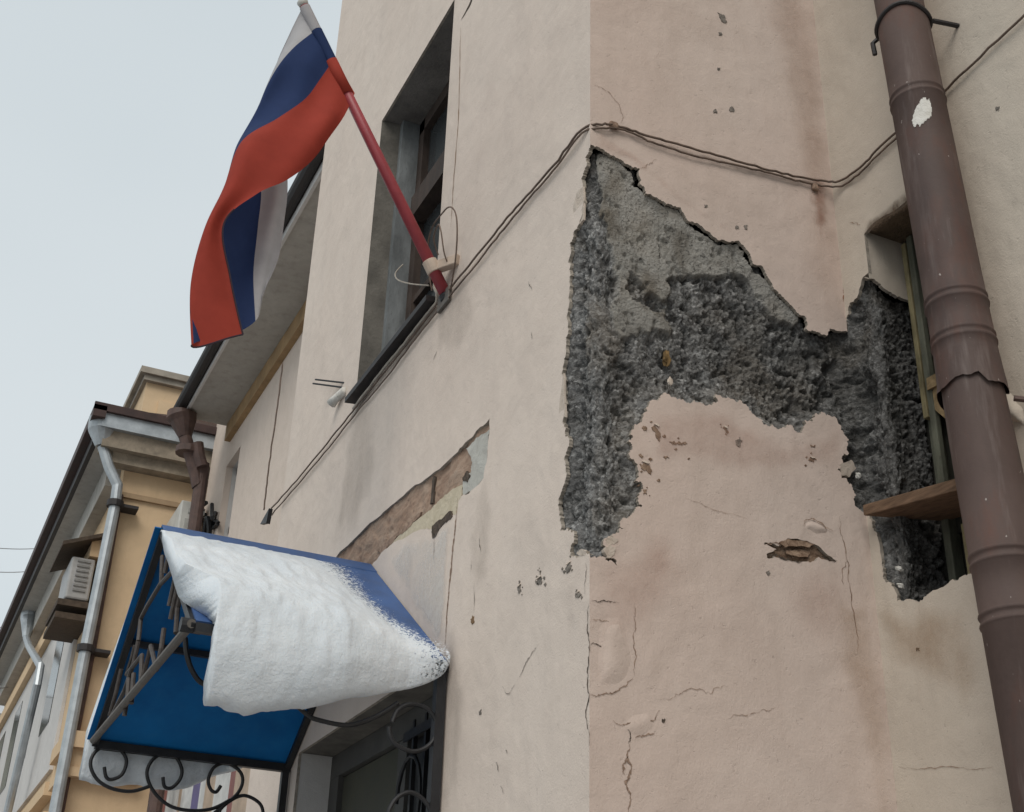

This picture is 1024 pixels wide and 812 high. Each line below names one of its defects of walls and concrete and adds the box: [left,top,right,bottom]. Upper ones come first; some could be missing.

flaking render [559,152,947,602]
flaking render [338,425,490,565]
crack [840,525,858,642]
crack [584,567,620,743]
crack [622,744,632,812]